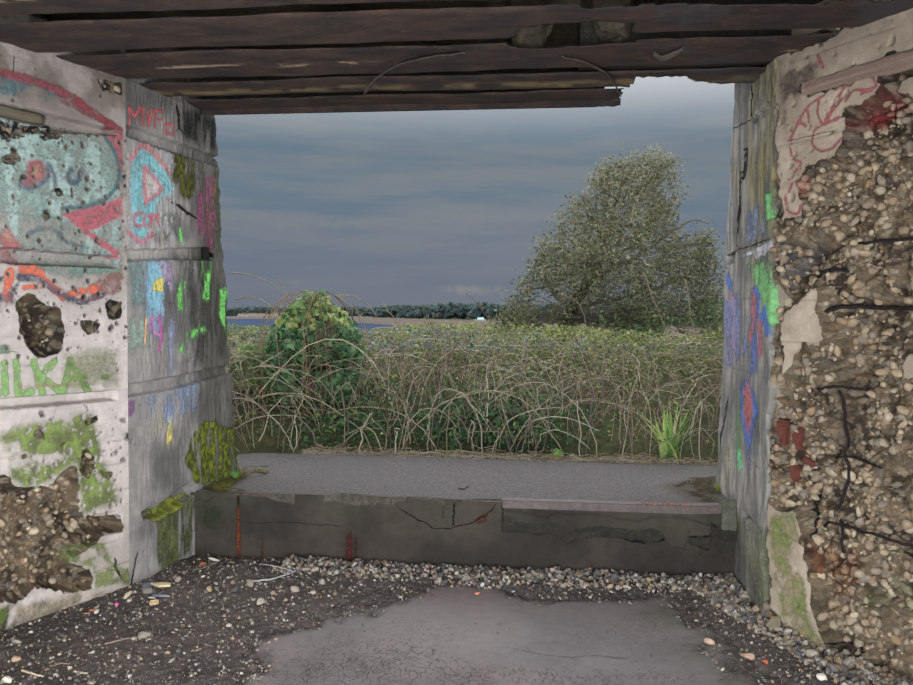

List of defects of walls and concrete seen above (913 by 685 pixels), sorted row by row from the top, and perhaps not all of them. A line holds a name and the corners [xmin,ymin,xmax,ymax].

spalling [16,293,65,358]
spalling [767,69,913,680]
spalling [0,448,124,604]
crack [395,501,504,530]
spalling [763,547,786,627]
crack [245,600,759,685]